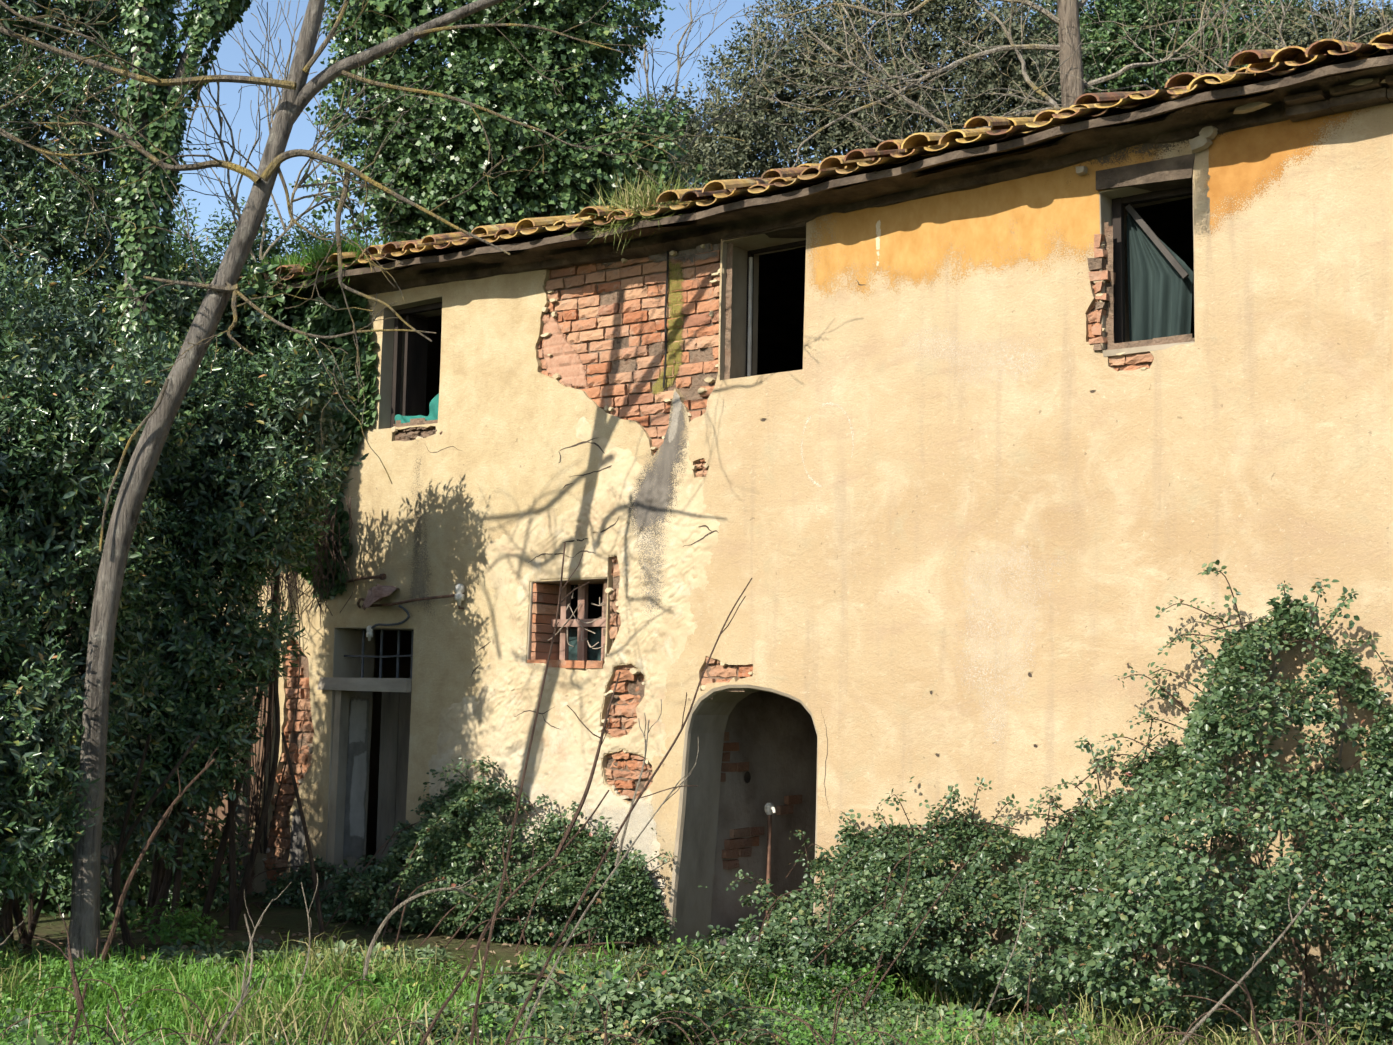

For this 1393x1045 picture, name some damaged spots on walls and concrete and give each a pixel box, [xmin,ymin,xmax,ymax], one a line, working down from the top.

damp [805,139,1190,401]
spalling [1087,222,1195,371]
flaking render [262,640,314,893]
flaking render [415,242,733,948]
damp [623,391,689,616]
spalling [701,656,753,699]